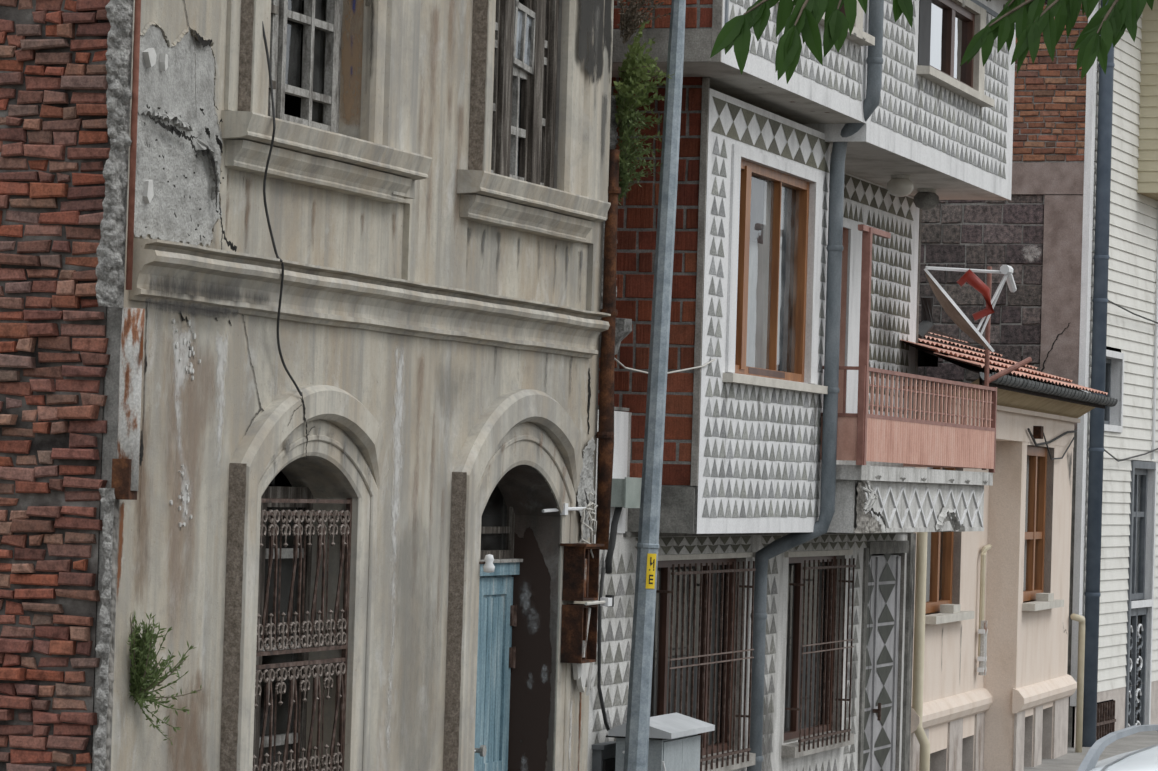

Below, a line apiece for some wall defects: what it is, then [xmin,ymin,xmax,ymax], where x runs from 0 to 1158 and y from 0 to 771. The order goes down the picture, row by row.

flaking render [134,21,224,247]